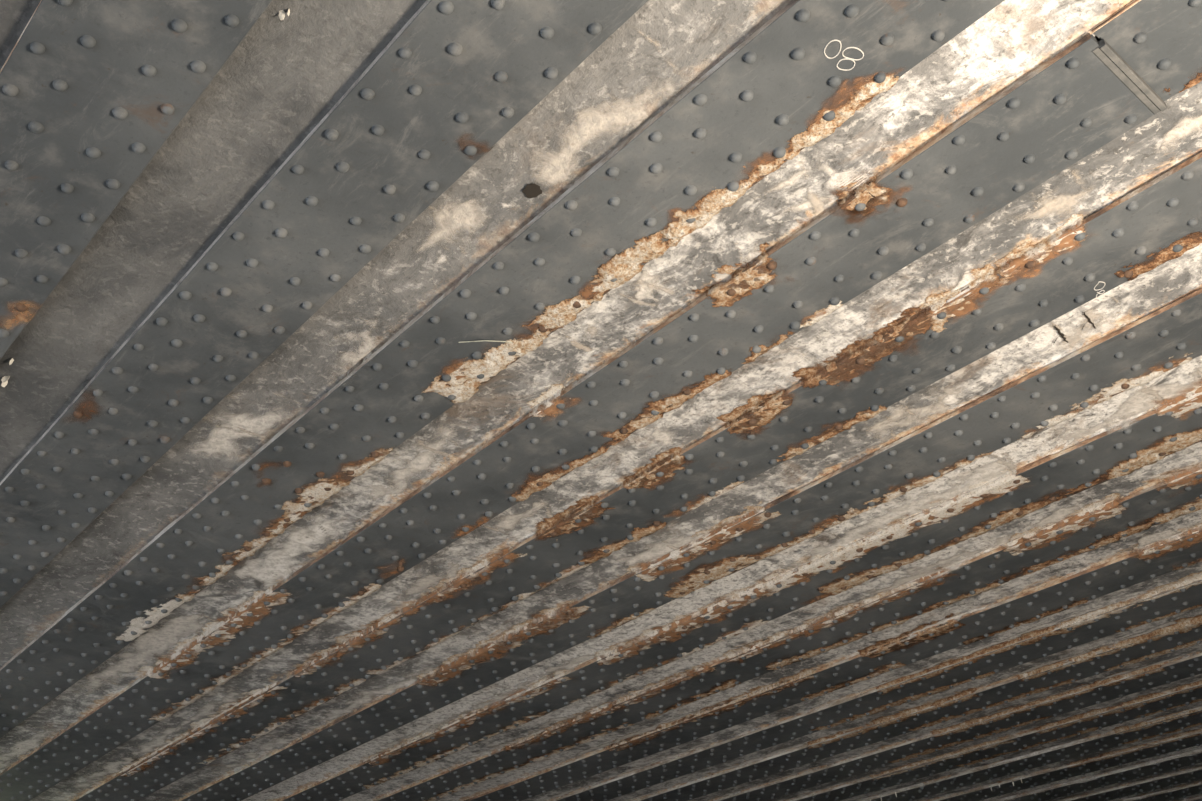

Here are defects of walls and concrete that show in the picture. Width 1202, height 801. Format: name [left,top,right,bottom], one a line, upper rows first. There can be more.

rust [3,302,38,329]
rust [422,74,909,403]
rust [506,301,844,501]
rust [717,211,1087,439]
rust [1018,353,1193,440]
rust [1115,231,1202,281]
rust [118,546,527,777]
rust [195,481,744,764]
rust [363,380,1202,801]